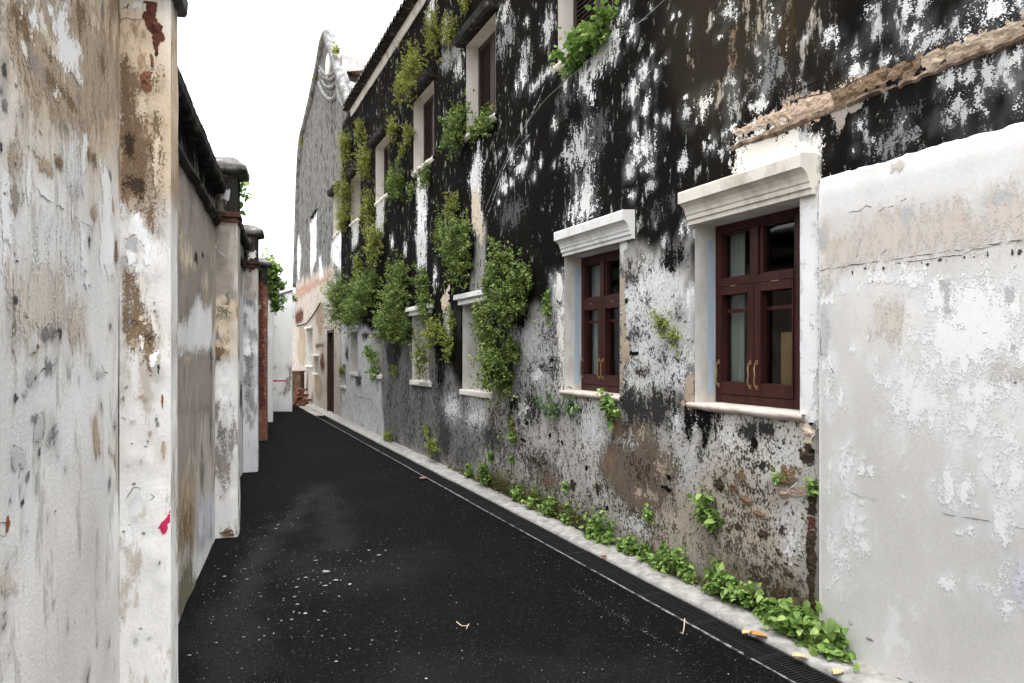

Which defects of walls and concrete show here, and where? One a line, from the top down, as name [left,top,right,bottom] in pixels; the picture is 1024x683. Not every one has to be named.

spalling [127,0,165,122]
mould [496,11,520,60]
mould [555,77,582,121]
spalling [682,0,1024,162]
damp [497,193,532,235]
mould [648,185,678,230]
crack [821,214,1023,271]
damp [0,0,263,624]
damp [595,350,723,524]
mould [736,420,774,442]
peeling [820,255,1024,624]
spalling [666,408,875,611]